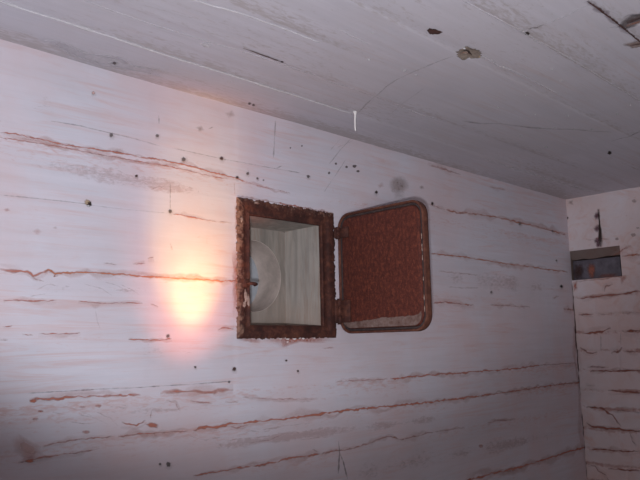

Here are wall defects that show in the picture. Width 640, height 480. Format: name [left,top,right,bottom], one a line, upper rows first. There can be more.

spalling [456,46,492,61]
crack [177,285,638,432]